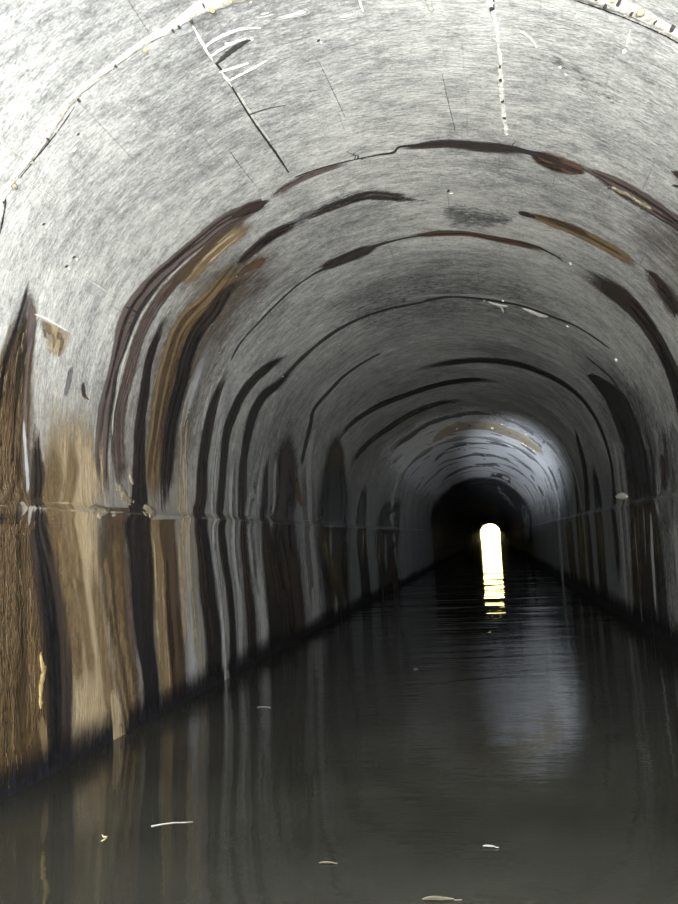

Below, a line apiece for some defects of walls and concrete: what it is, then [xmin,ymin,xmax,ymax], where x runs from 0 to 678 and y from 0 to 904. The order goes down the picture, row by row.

spalling [0,0,252,233]
spalling [206,27,268,81]
crack [193,0,574,177]
spalling [575,0,678,54]
water stain [0,164,678,802]